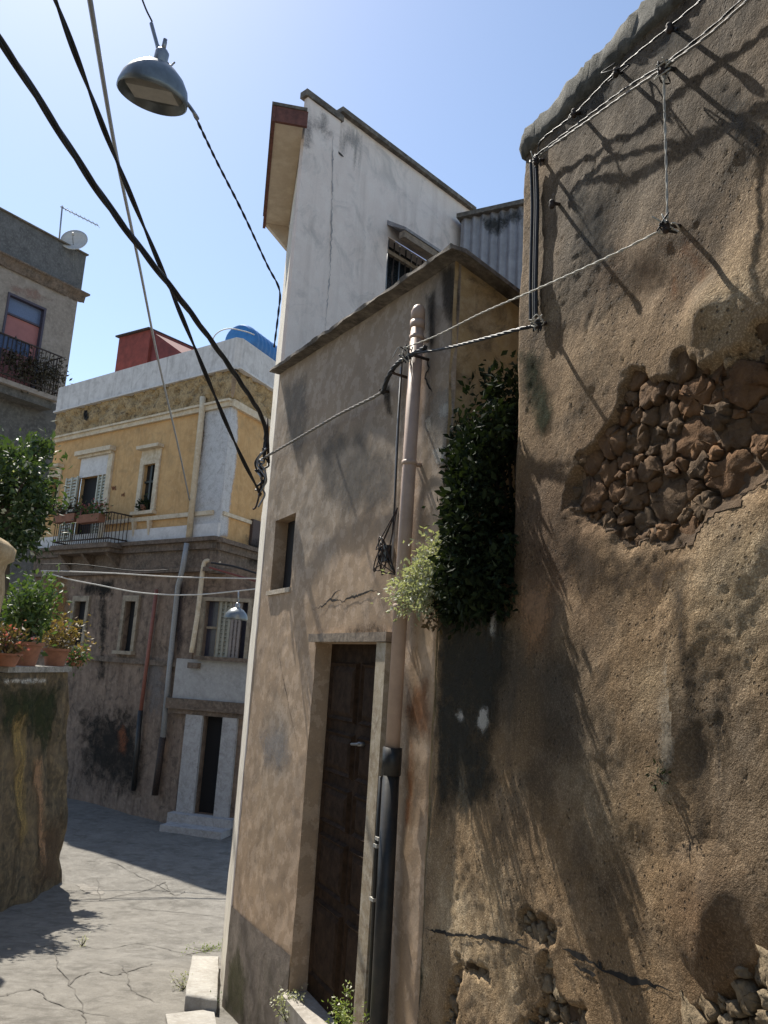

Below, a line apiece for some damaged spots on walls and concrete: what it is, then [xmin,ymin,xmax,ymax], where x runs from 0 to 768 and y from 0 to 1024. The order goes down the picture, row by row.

spalling [568,323,768,551]
crack [320,588,377,608]
leakage [81,709,142,794]
leakage [435,605,511,820]
leakage [661,696,672,779]
leakage [12,717,63,894]
spalling [446,961,487,1024]
crack [425,928,533,953]
spalling [524,910,587,1024]
crack [562,948,673,992]
spalling [679,944,768,1024]